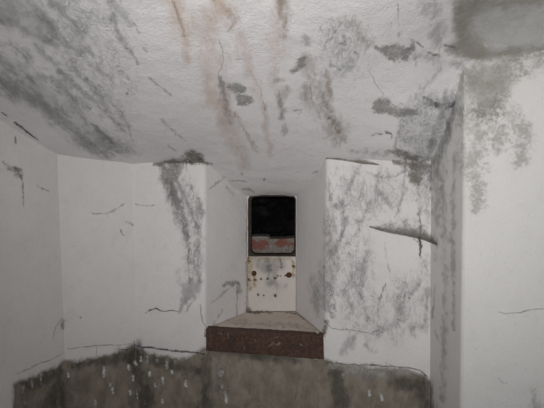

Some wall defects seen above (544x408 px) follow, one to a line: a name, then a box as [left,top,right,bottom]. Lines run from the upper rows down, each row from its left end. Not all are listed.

damp [449,0,544,59]
damp [403,94,455,188]
crack [122,344,205,355]